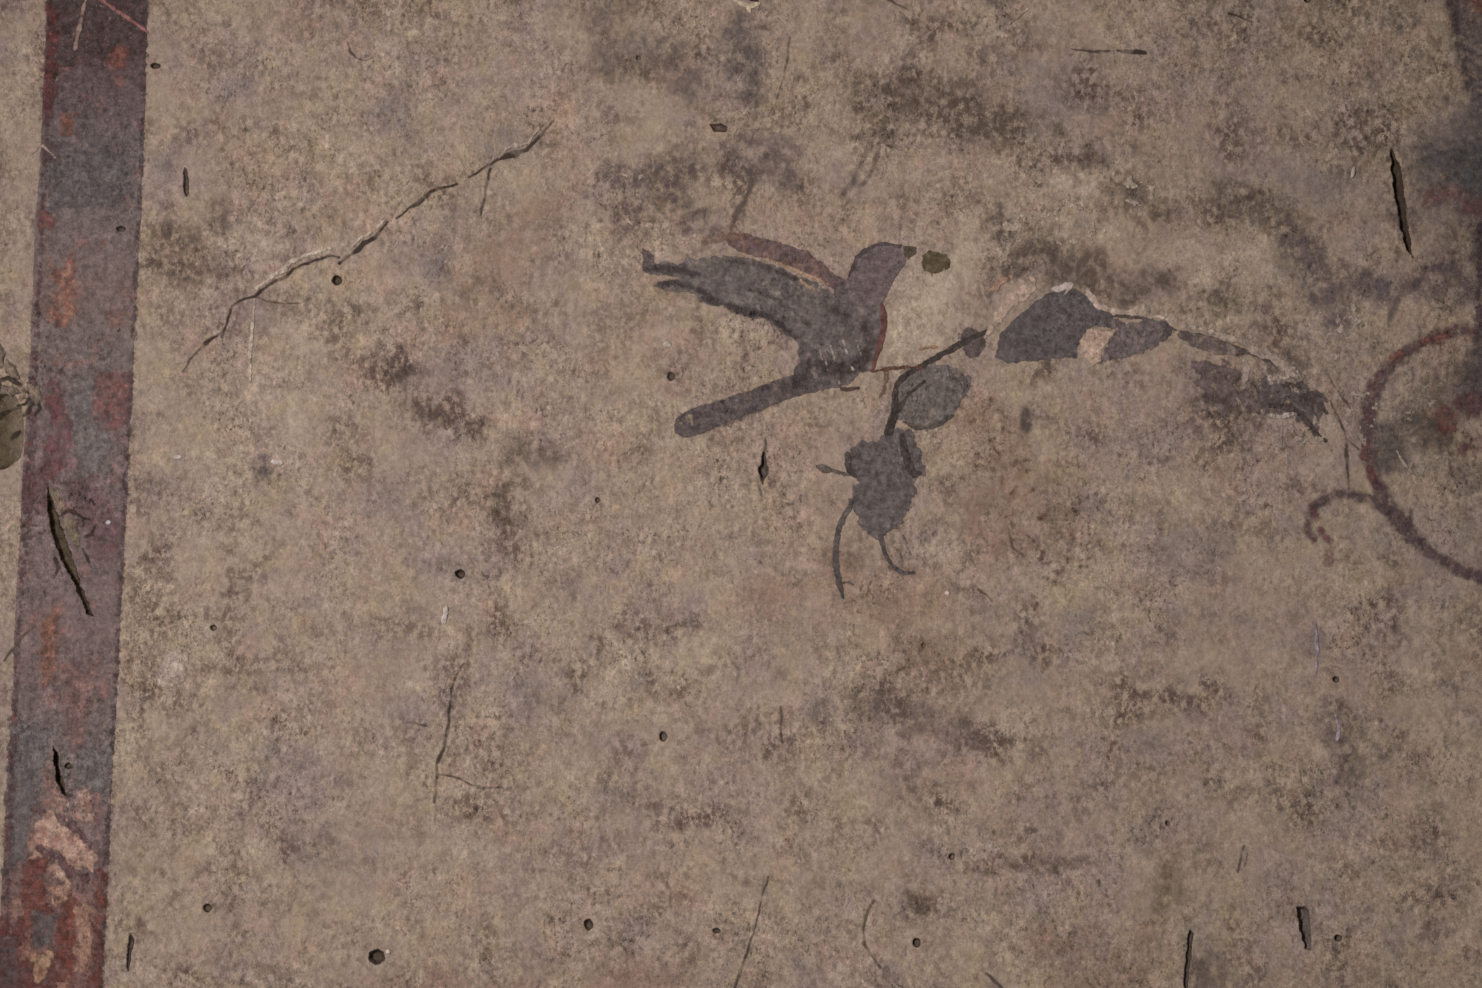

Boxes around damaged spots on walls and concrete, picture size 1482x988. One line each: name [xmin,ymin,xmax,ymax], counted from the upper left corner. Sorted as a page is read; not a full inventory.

crack [186,121,551,367]
flaking render [983,275,1165,366]
flaking render [0,345,111,636]